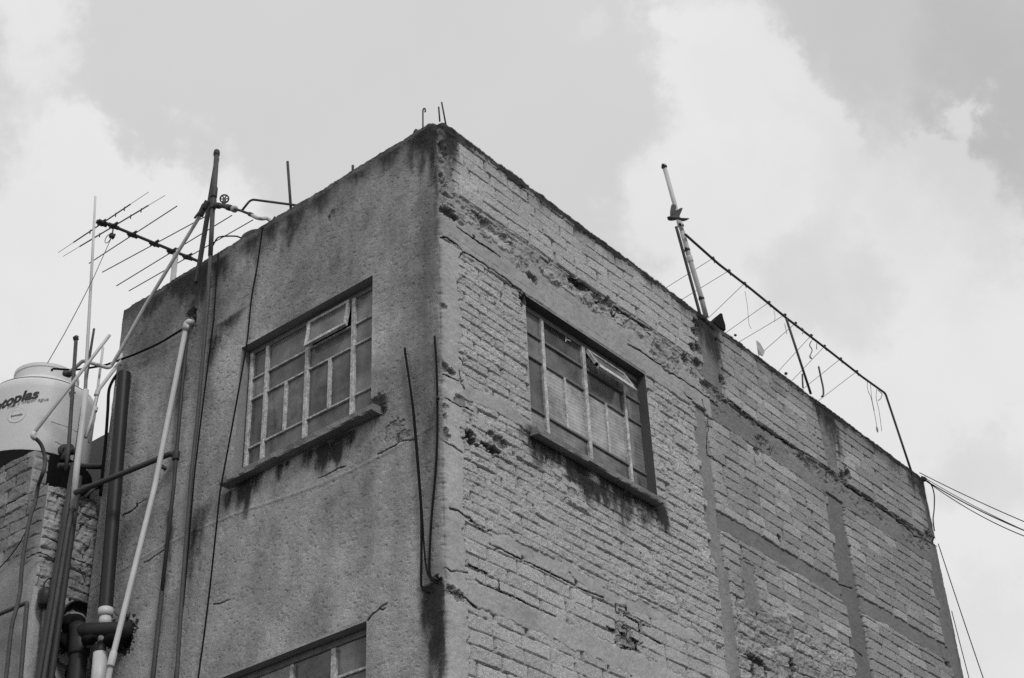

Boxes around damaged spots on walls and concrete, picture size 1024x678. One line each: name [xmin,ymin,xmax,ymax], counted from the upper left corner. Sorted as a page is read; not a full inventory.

leakage [246,210,303,252]
peeling [437,140,521,257]
peeling [522,266,623,326]
leakage [224,473,261,510]
leakage [302,430,355,470]
spalling [442,394,507,459]
leakage [521,426,669,532]
leakage [676,297,930,517]
leakage [421,583,445,676]